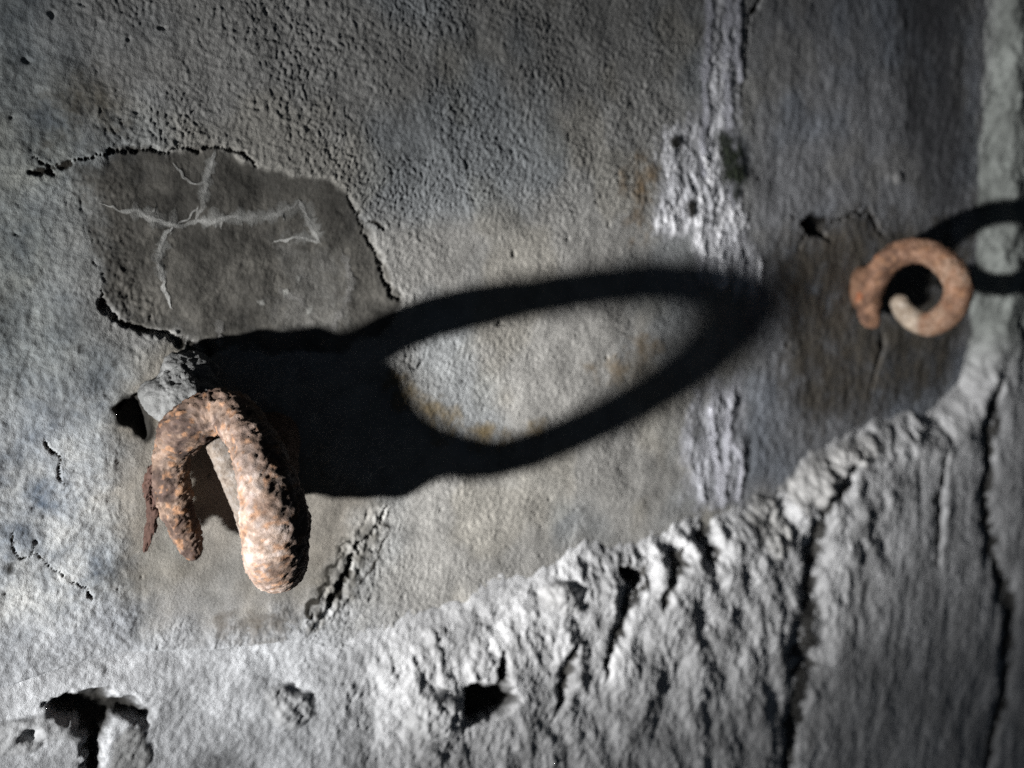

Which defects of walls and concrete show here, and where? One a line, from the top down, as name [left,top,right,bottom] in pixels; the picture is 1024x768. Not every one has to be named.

spalling [77,146,401,354]
rust [142,465,159,553]
crack [304,503,392,631]